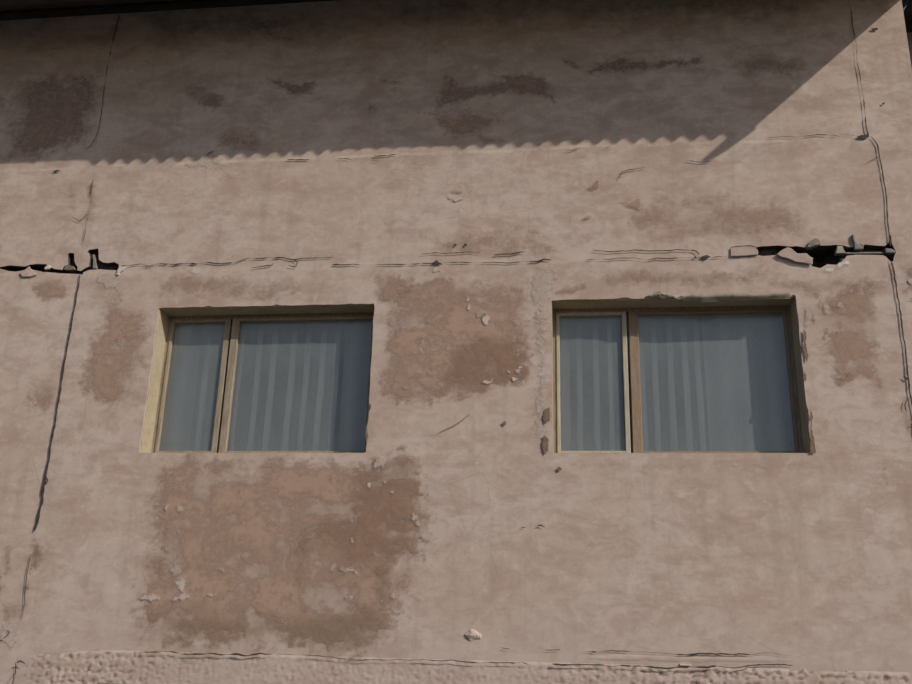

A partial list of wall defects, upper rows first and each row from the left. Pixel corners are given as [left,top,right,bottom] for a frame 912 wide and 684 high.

crack [85,15,120,149]
crack [767,0,912,425]
spalling [0,249,127,298]
crack [121,251,551,268]
crack [588,245,757,260]
spalling [730,234,896,268]
peeling [79,309,144,401]
peeling [380,274,529,405]
peeling [824,327,878,384]
peeling [140,448,426,660]
crack [133,648,529,665]
crack [548,649,792,669]